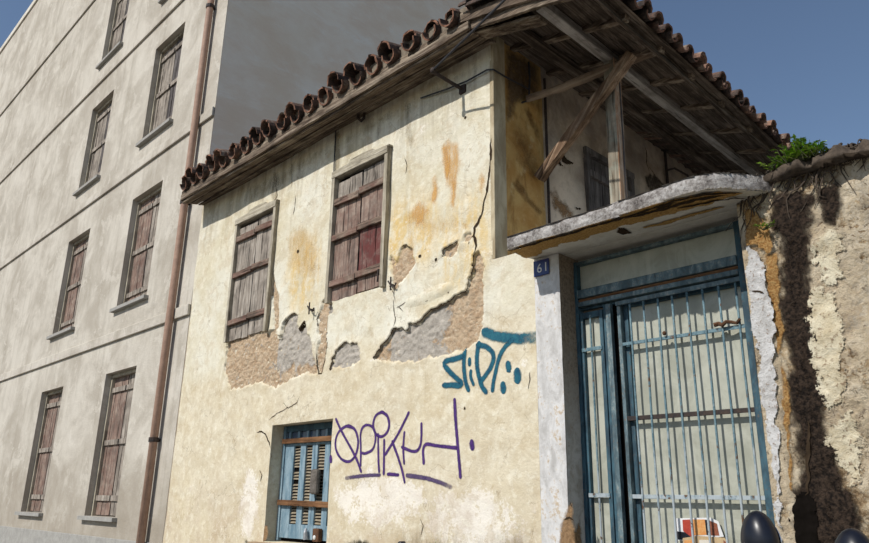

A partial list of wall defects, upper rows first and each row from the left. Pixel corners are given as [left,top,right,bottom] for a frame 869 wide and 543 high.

flaking render [226,277,360,390]
flaking render [391,244,416,290]
flaking render [373,254,485,363]
flaking render [442,241,458,258]
crack [468,141,492,252]
spalling [509,192,743,258]
crack [509,193,745,251]
flaking render [645,174,664,190]
peeling [745,245,783,539]
leakage [770,182,861,543]